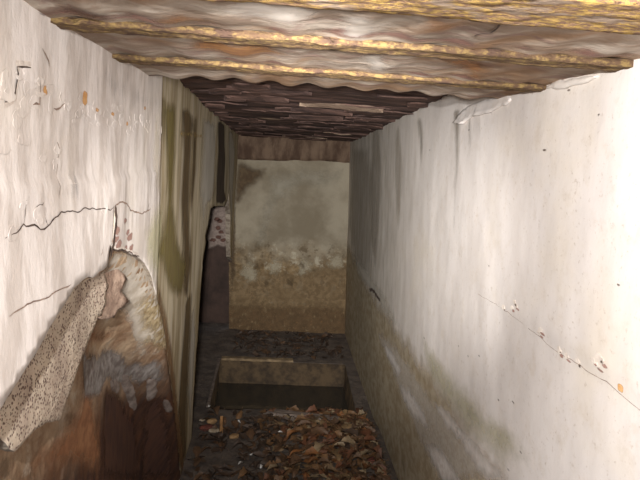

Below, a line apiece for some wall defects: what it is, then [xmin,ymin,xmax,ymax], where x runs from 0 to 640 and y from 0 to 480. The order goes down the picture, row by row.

peeling [0,66,153,145]
crack [6,201,151,259]
flaking render [207,206,226,249]
crack [9,285,70,317]
leakage [178,111,499,480]
spalling [0,219,180,480]
crack [477,293,637,408]